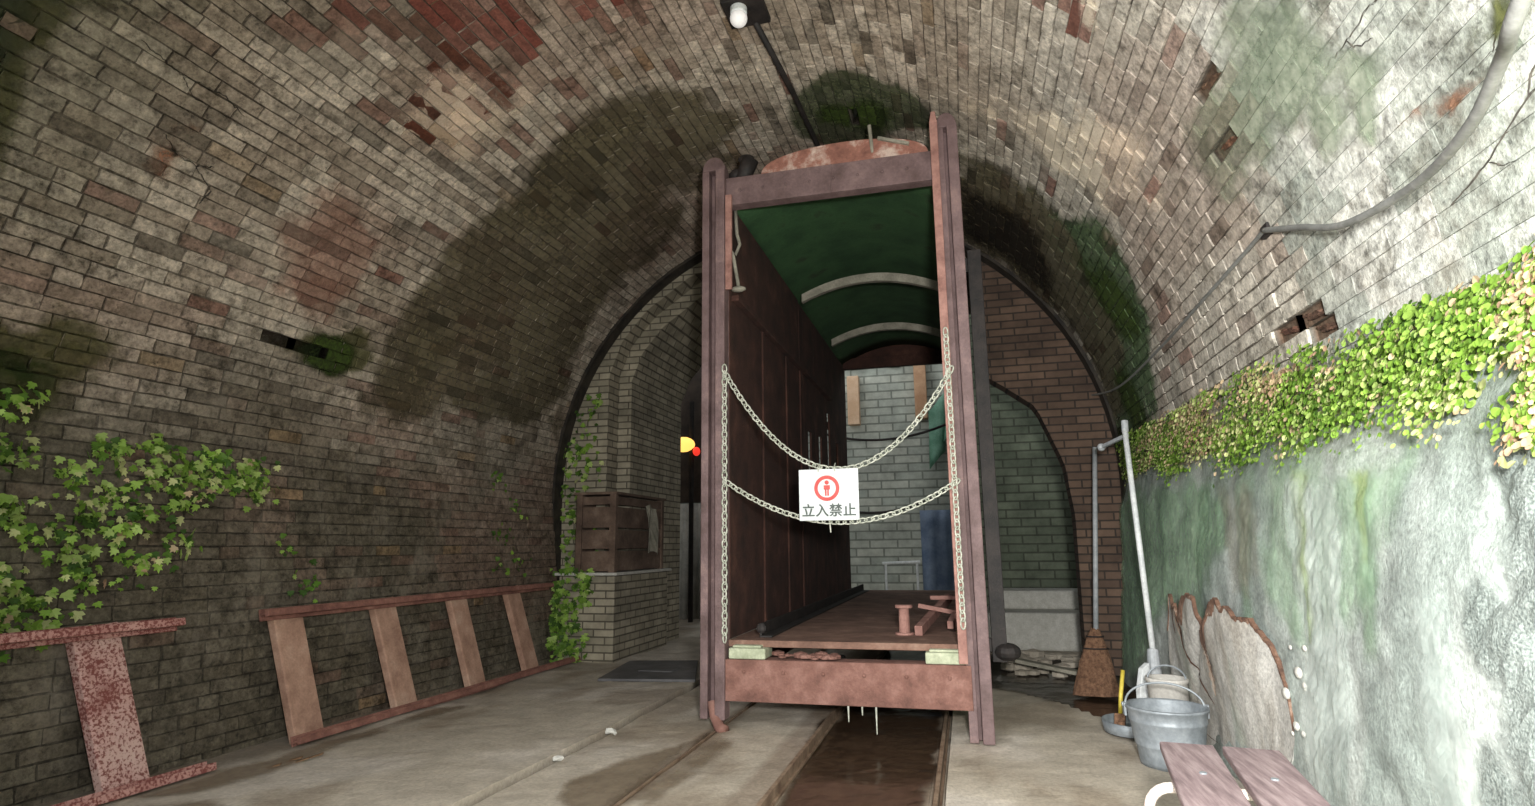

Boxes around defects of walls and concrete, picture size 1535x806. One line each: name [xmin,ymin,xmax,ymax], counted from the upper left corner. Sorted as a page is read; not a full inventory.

spalling [1201,71,1223,90]
damp [368,85,742,432]
spalling [1280,309,1339,335]